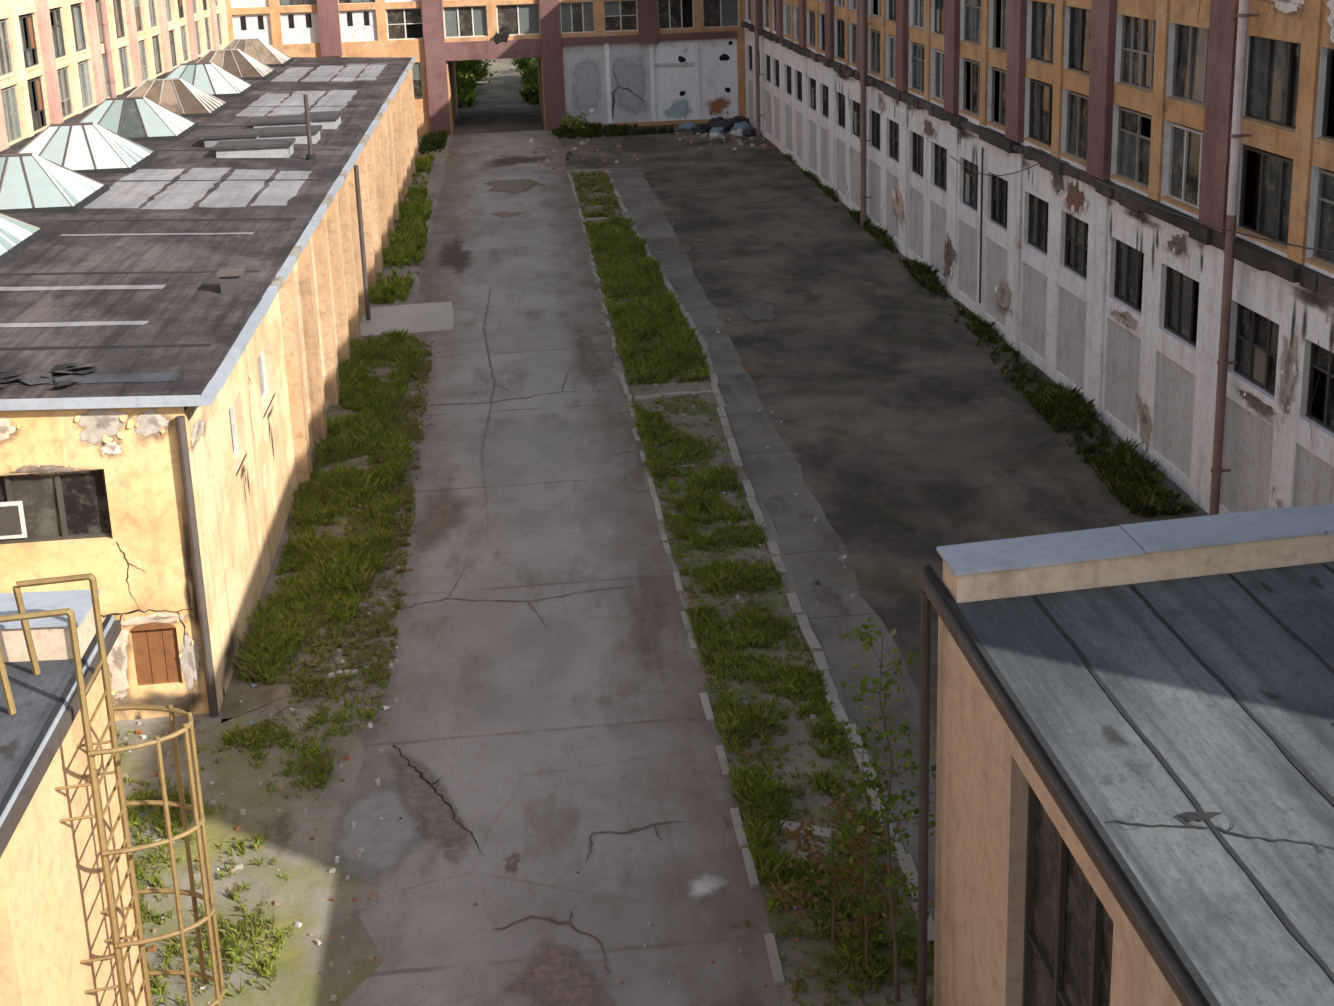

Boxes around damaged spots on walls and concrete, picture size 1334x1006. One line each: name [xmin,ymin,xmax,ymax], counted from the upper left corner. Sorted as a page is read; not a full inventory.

peeling [1261,0,1304,15]
peeling [1325,0,1334,43]
peeling [0,418,20,441]
peeling [74,408,172,457]
crack [428,289,617,529]
crack [101,542,193,651]
crack [394,745,483,855]
crack [585,821,683,863]
crack [1107,813,1334,856]
crack [494,903,611,972]